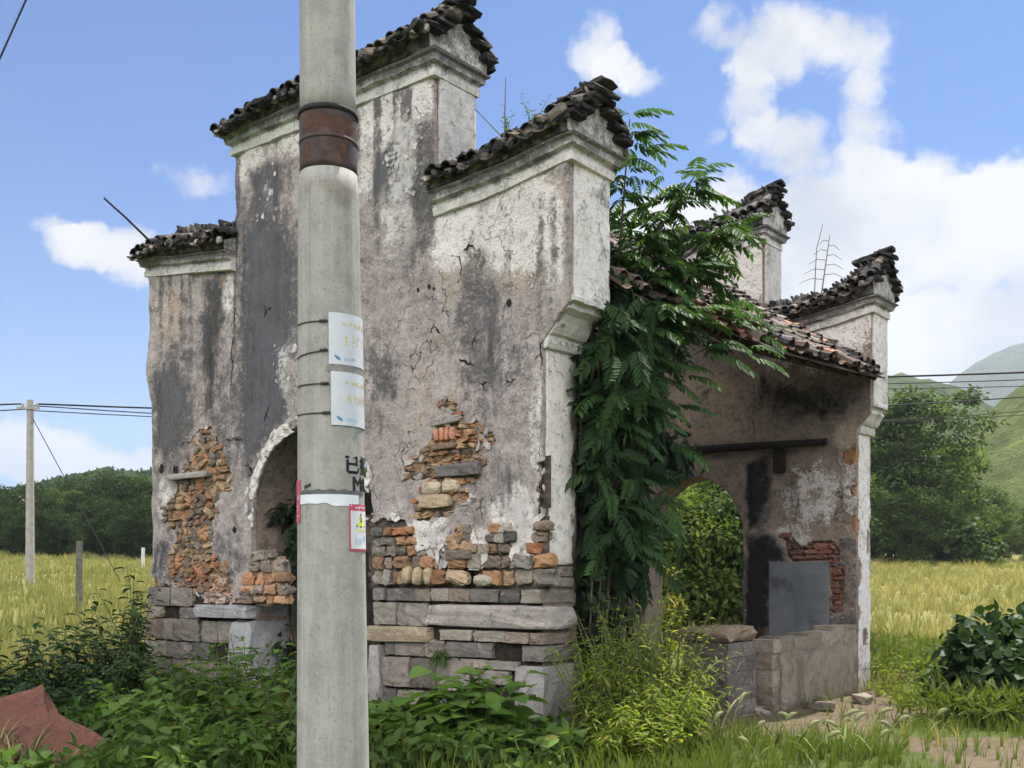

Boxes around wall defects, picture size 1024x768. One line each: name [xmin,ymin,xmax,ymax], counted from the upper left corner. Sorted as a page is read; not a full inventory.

damp [373,143,400,199]
damp [203,285,222,409]
spalling [160,427,297,606]
damp [242,165,291,473]
peeling [244,344,298,527]
spalling [364,397,562,592]
crack [459,336,544,391]
damp [745,457,783,641]
spalling [778,532,845,613]
spalling [846,512,859,539]